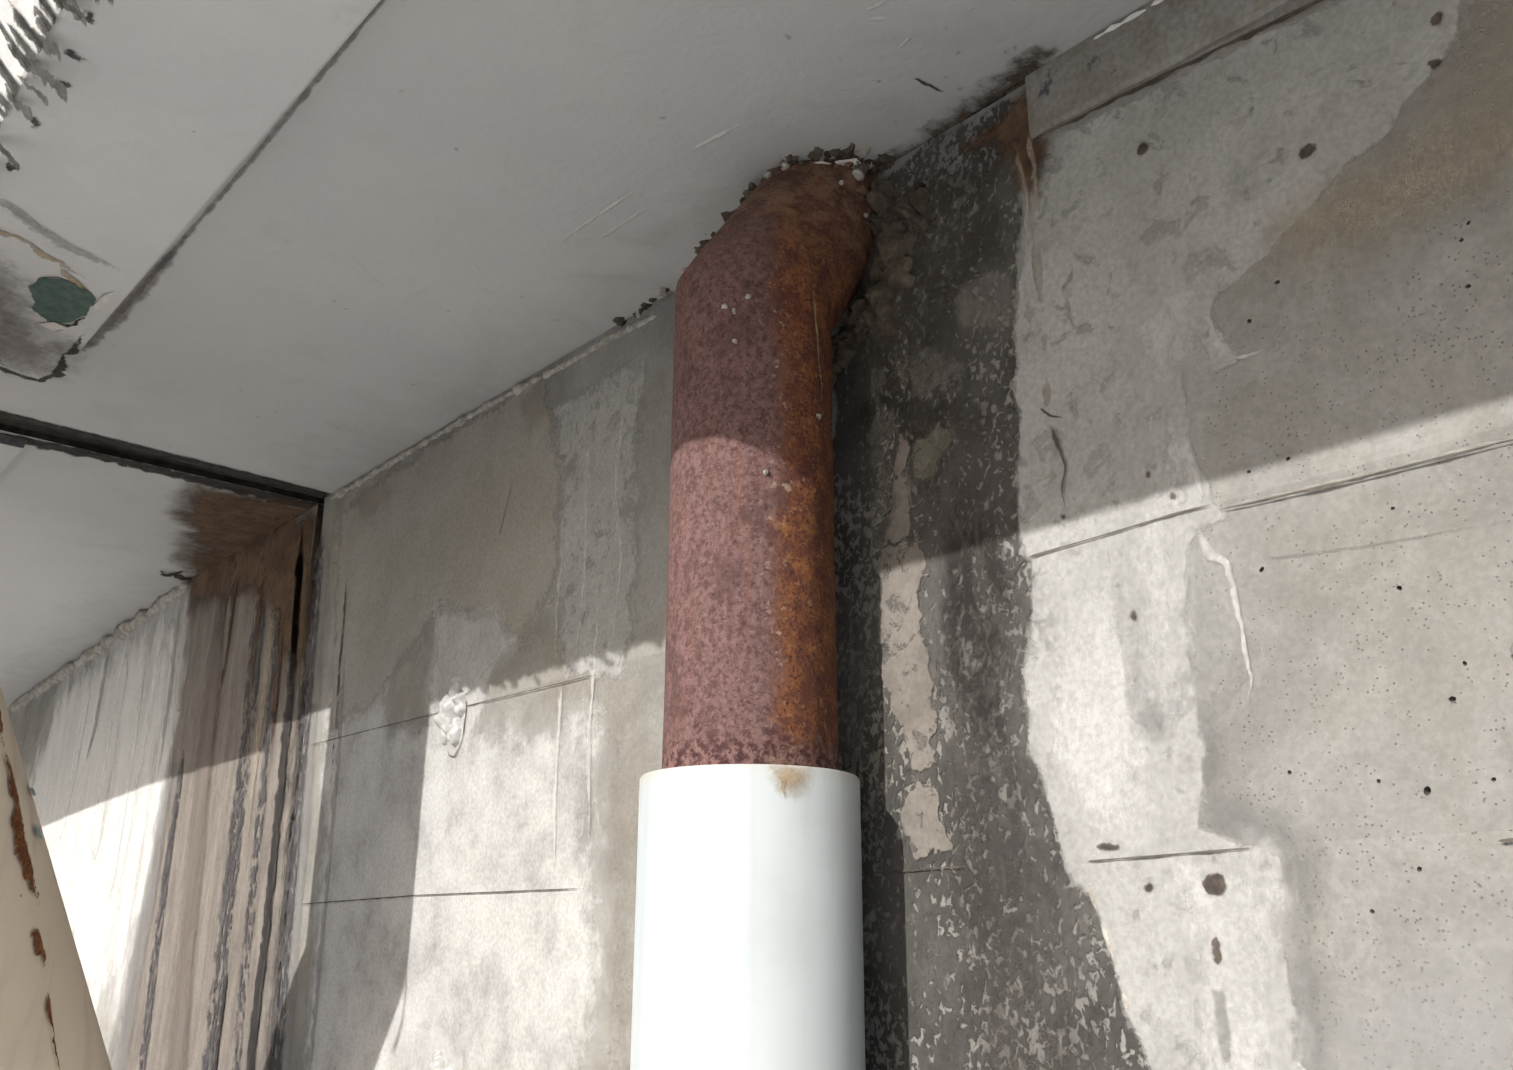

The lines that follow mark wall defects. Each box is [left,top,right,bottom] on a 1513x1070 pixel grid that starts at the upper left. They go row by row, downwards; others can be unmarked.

peeling [0,202,114,331]
leakage [27,359,646,1070]
rust [0,711,42,900]
rust [30,929,46,967]
rust [46,994,60,1069]